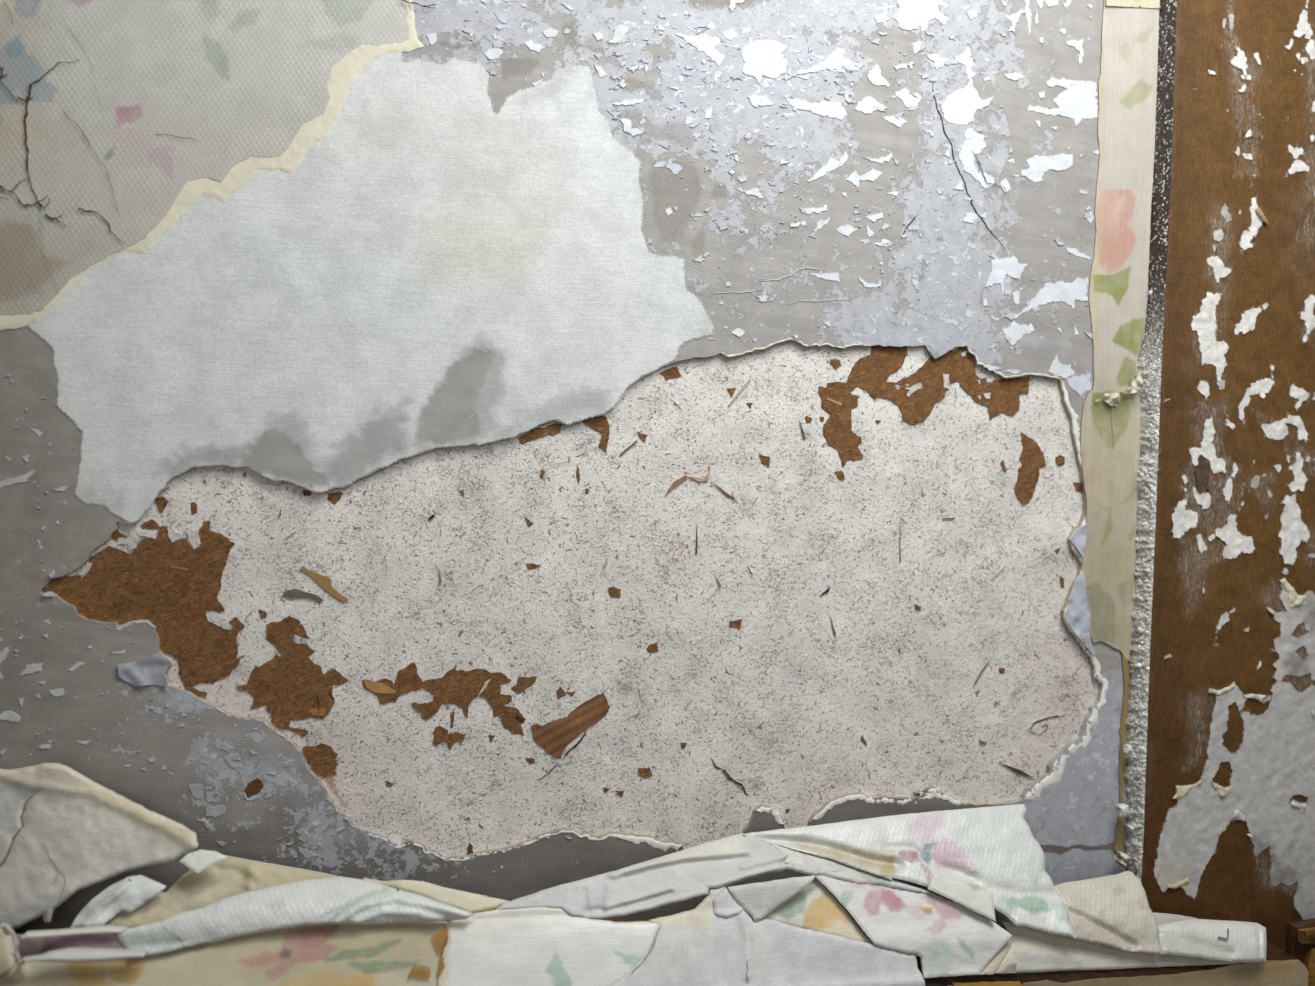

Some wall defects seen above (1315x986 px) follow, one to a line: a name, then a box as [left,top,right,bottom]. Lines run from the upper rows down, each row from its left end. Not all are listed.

peeling [613,99,646,136]
peeling [675,29,921,128]
peeling [874,0,1073,193]
peeling [1028,77,1098,130]
peeling [1065,39,1084,64]
peeling [807,144,893,197]
crack [932,81,1005,247]
peeling [803,205,894,266]
peeling [978,256,1088,345]
peeling [1194,454,1210,492]
spalling [42,328,1108,861]
peeling [0,663,64,722]